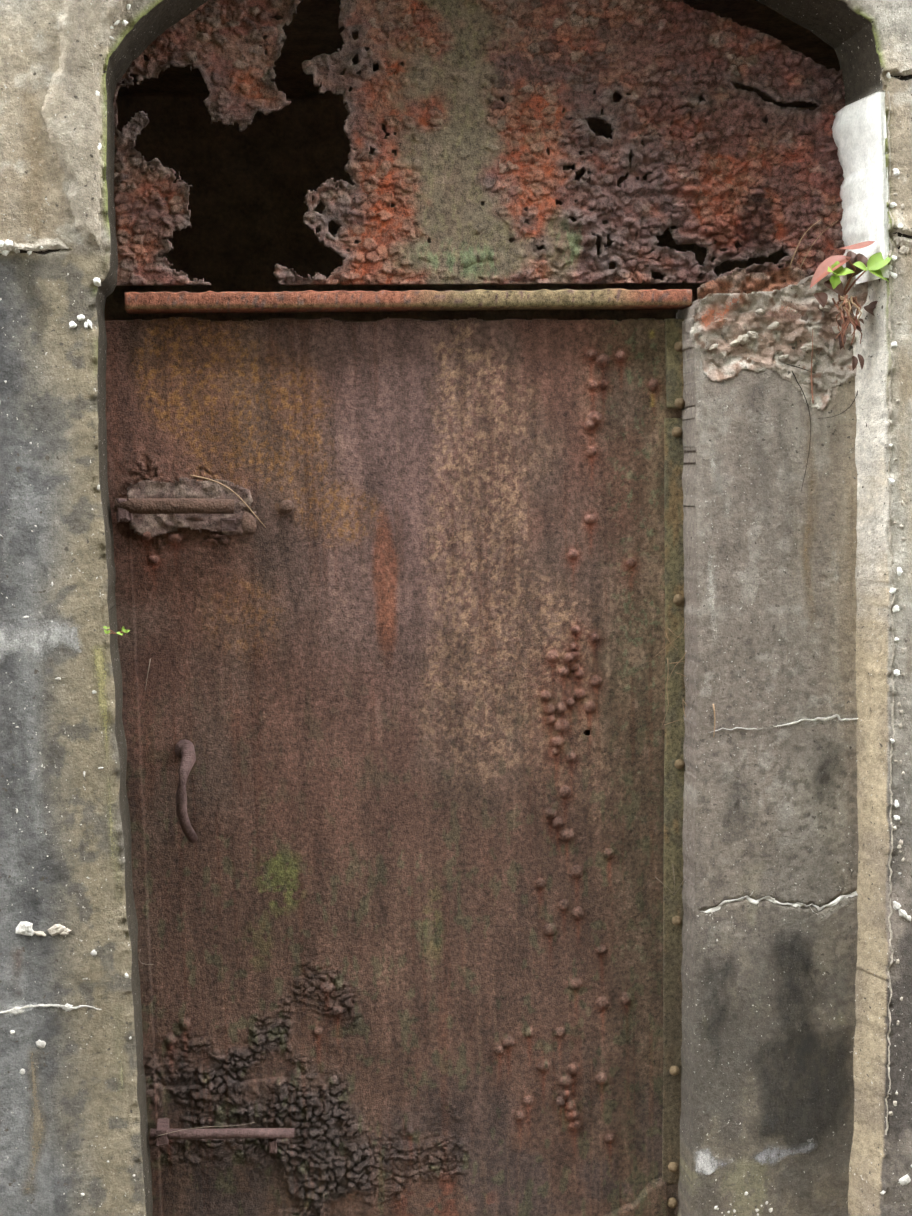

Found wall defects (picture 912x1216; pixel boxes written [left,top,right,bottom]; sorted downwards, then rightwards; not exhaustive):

spalling [690,272,868,411]
spalling [889,567,903,612]
crack [885,62,912,1135]
crack [715,714,858,731]
crack [700,890,858,918]
crack [0,1003,102,1016]